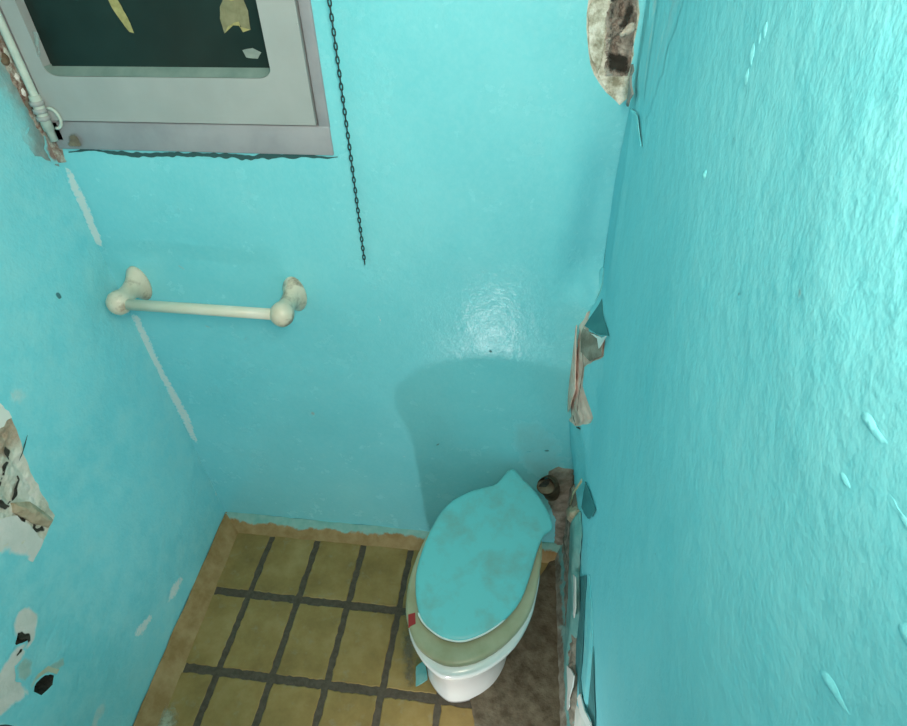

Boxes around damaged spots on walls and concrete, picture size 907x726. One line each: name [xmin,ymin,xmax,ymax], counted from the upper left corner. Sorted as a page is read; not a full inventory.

spalling [0,418,55,562]
peeling [0,605,65,718]